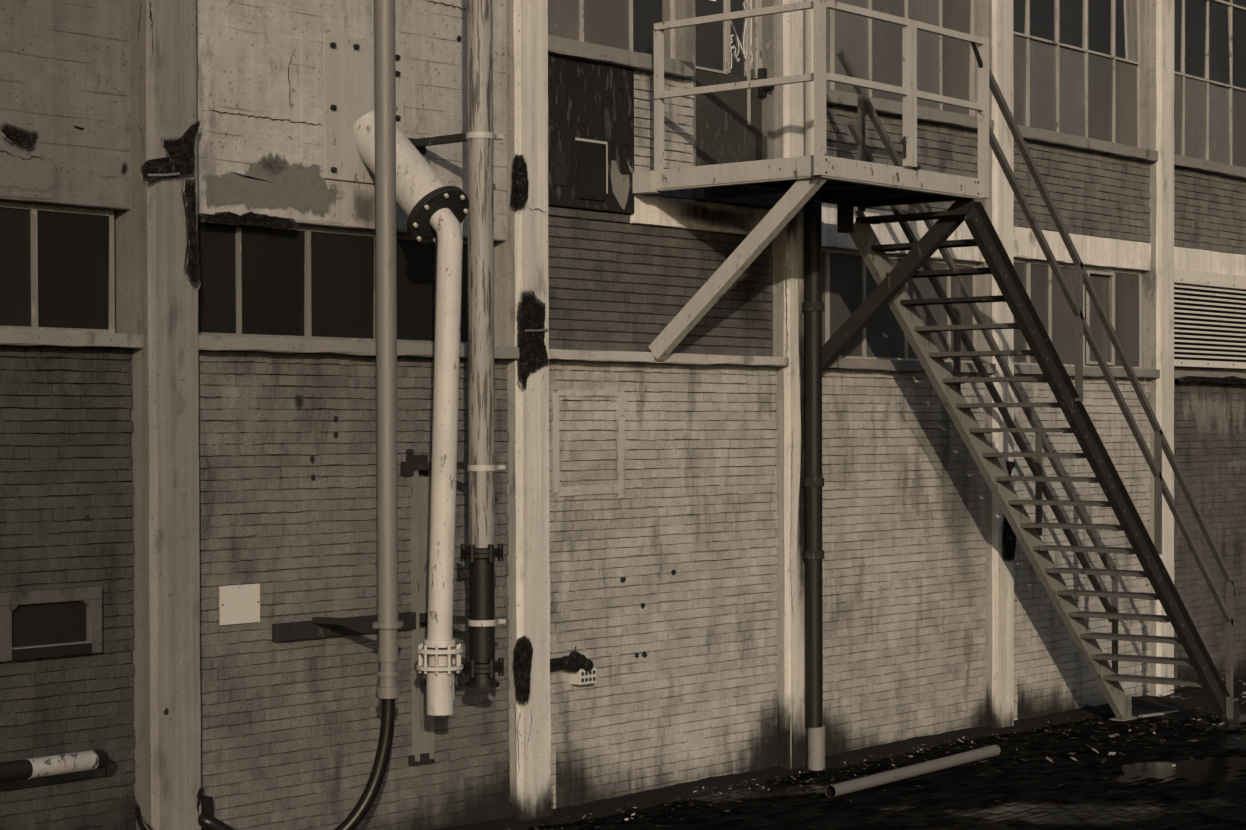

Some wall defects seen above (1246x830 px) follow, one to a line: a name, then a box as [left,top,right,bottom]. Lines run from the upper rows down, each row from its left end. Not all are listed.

spalling [0,124,38,151]
spalling [139,122,299,290]
spalling [509,154,529,212]
spalling [516,290,549,391]
spalling [1002,515,1016,561]
spalling [512,635,533,706]